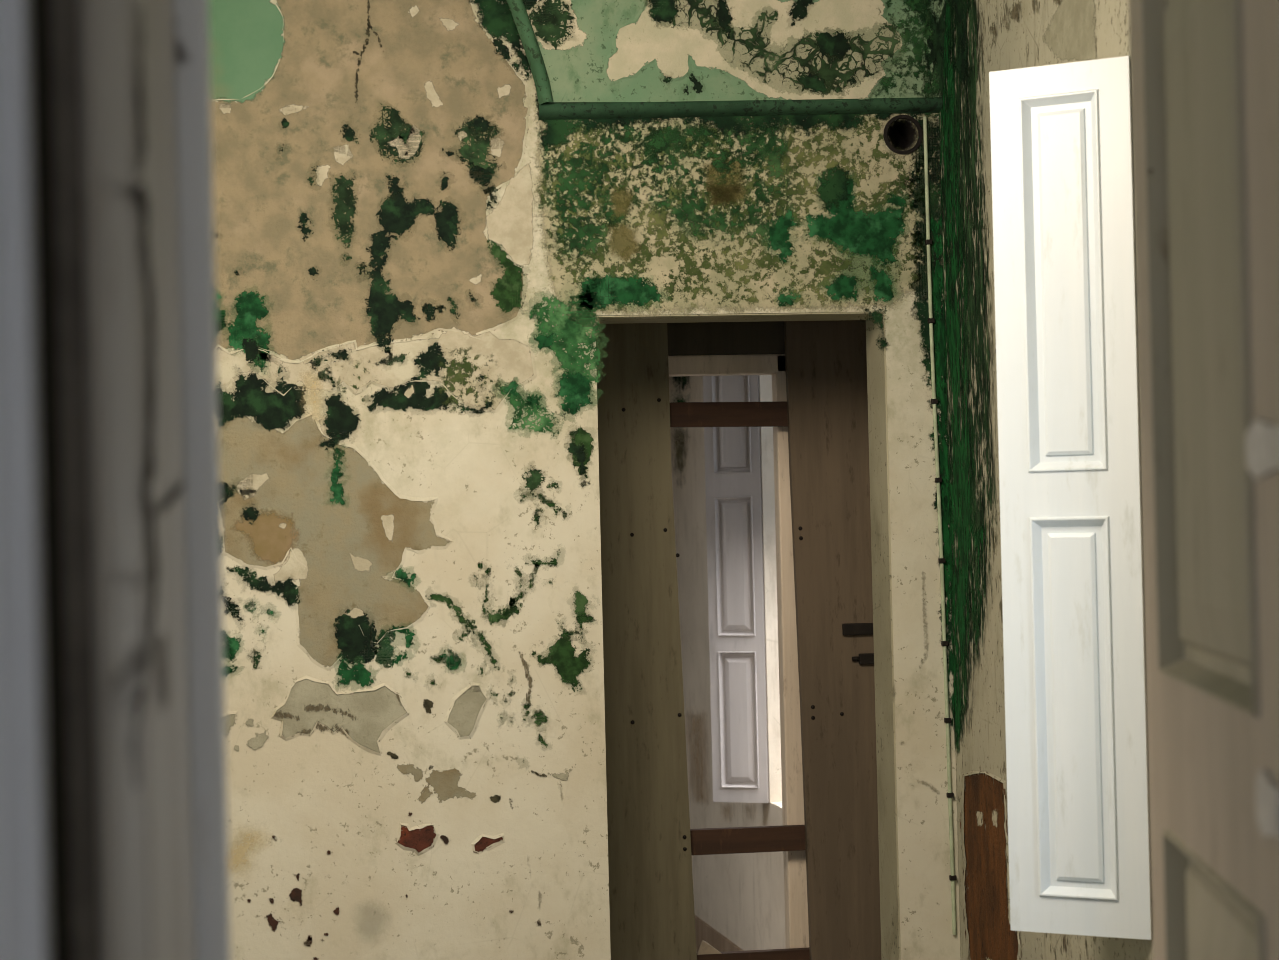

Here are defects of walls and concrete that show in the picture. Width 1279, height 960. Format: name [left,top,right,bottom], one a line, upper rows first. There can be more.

spalling [209,0,941,414]
leakage [215,0,996,753]
peeling [266,898,280,932]
peeling [289,873,302,906]
spalling [219,412,513,856]
peeling [531,764,576,781]